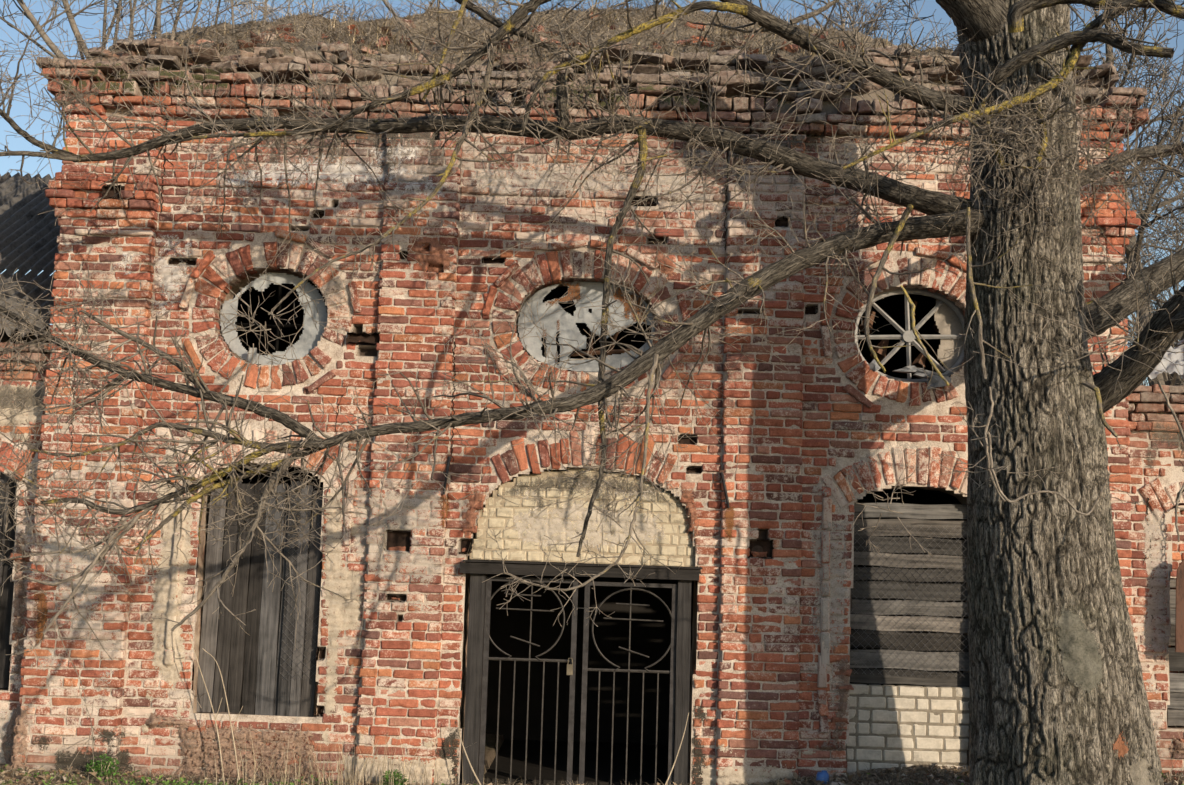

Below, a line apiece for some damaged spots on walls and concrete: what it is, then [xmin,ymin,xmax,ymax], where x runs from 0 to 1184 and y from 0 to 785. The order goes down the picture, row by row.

crack [1143,460,1184,641]